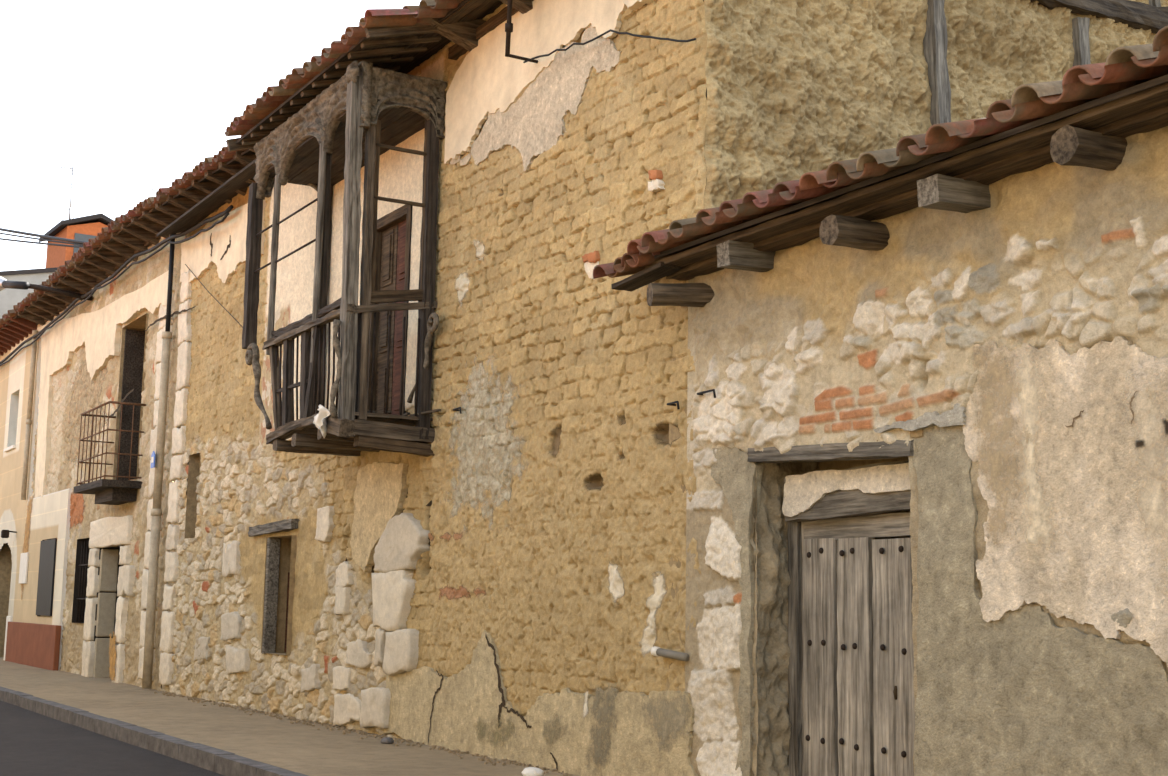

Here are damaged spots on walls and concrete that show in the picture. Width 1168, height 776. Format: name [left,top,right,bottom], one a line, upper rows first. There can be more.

flaking render [444,0,654,172]
flaking render [35,203,248,498]
crack [485,635,531,728]
spalling [912,336,1168,776]